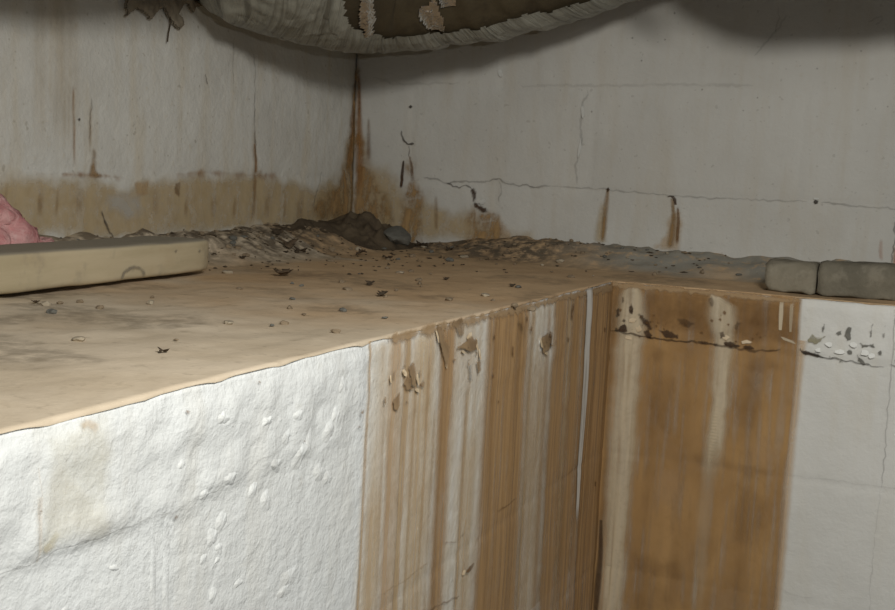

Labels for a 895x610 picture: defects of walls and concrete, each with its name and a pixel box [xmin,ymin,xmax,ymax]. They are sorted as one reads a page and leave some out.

corrosion [316,73,501,242]
damp [0,177,345,236]
corrosion [668,196,680,246]
spalling [604,306,761,349]
peeling [801,326,882,366]
damp [381,281,801,610]